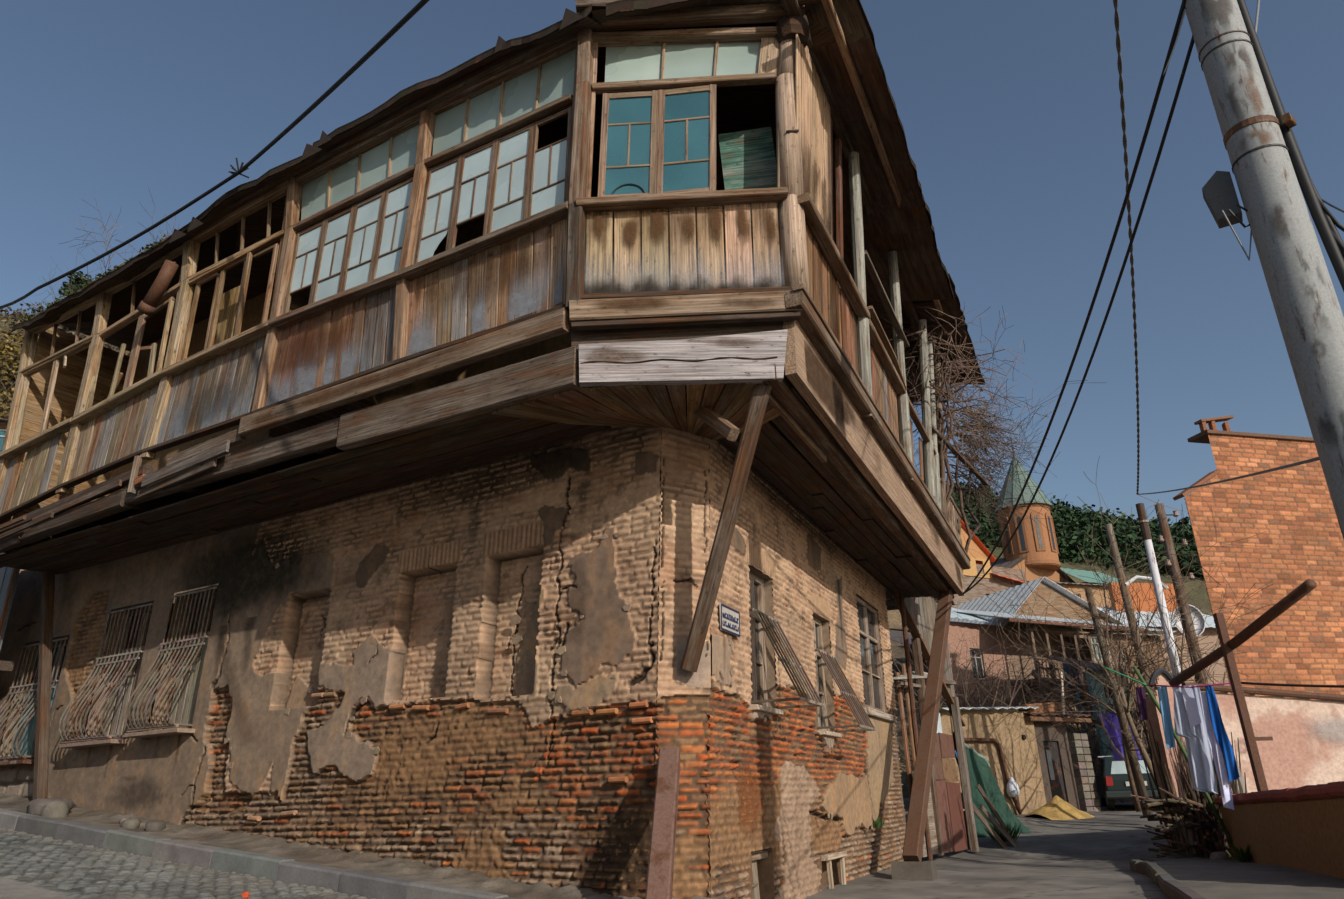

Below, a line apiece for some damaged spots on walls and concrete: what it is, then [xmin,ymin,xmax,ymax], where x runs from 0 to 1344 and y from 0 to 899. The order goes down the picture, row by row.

water stain [192,531,304,616]
crack [497,475,577,764]
spalling [182,526,906,899]
crack [626,457,709,687]